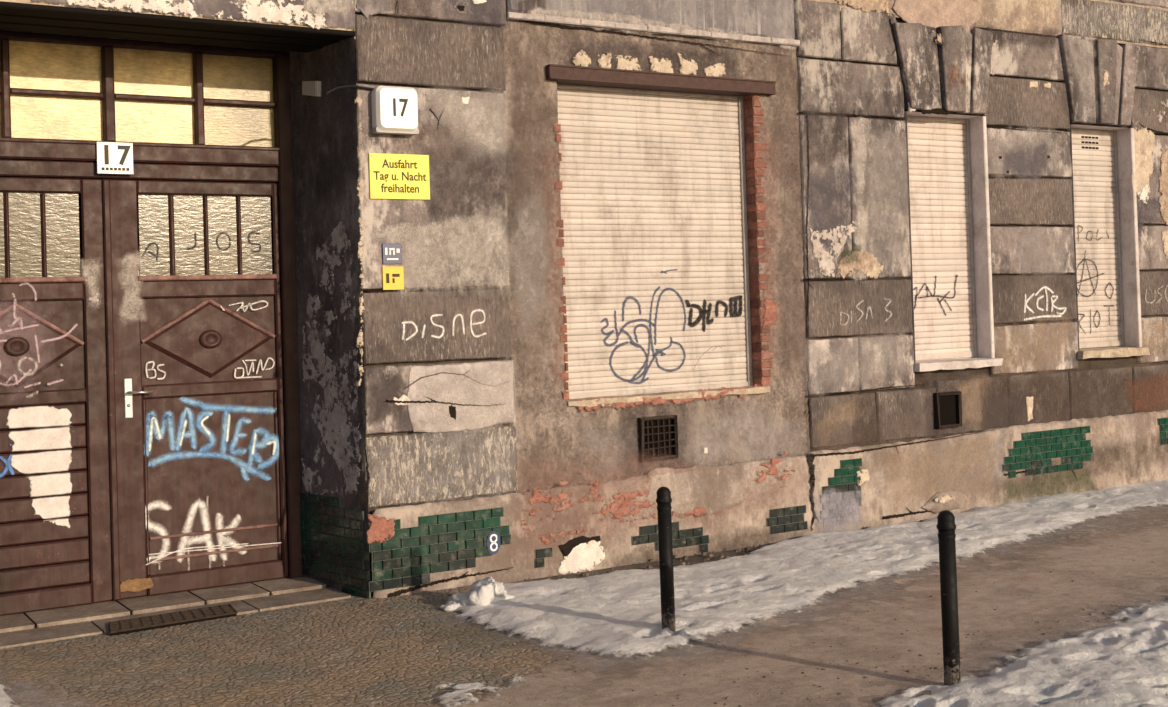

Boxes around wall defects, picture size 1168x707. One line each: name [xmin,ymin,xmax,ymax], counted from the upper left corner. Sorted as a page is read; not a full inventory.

peeling [66,0,327,30]
spalling [572,49,726,77]
flaking render [553,124,562,161]
spalling [1131,100,1168,259]
peeling [301,96,365,496]
flaking render [556,94,778,412]
peeling [810,221,884,279]
crack [799,18,999,530]
flaking render [521,471,707,575]